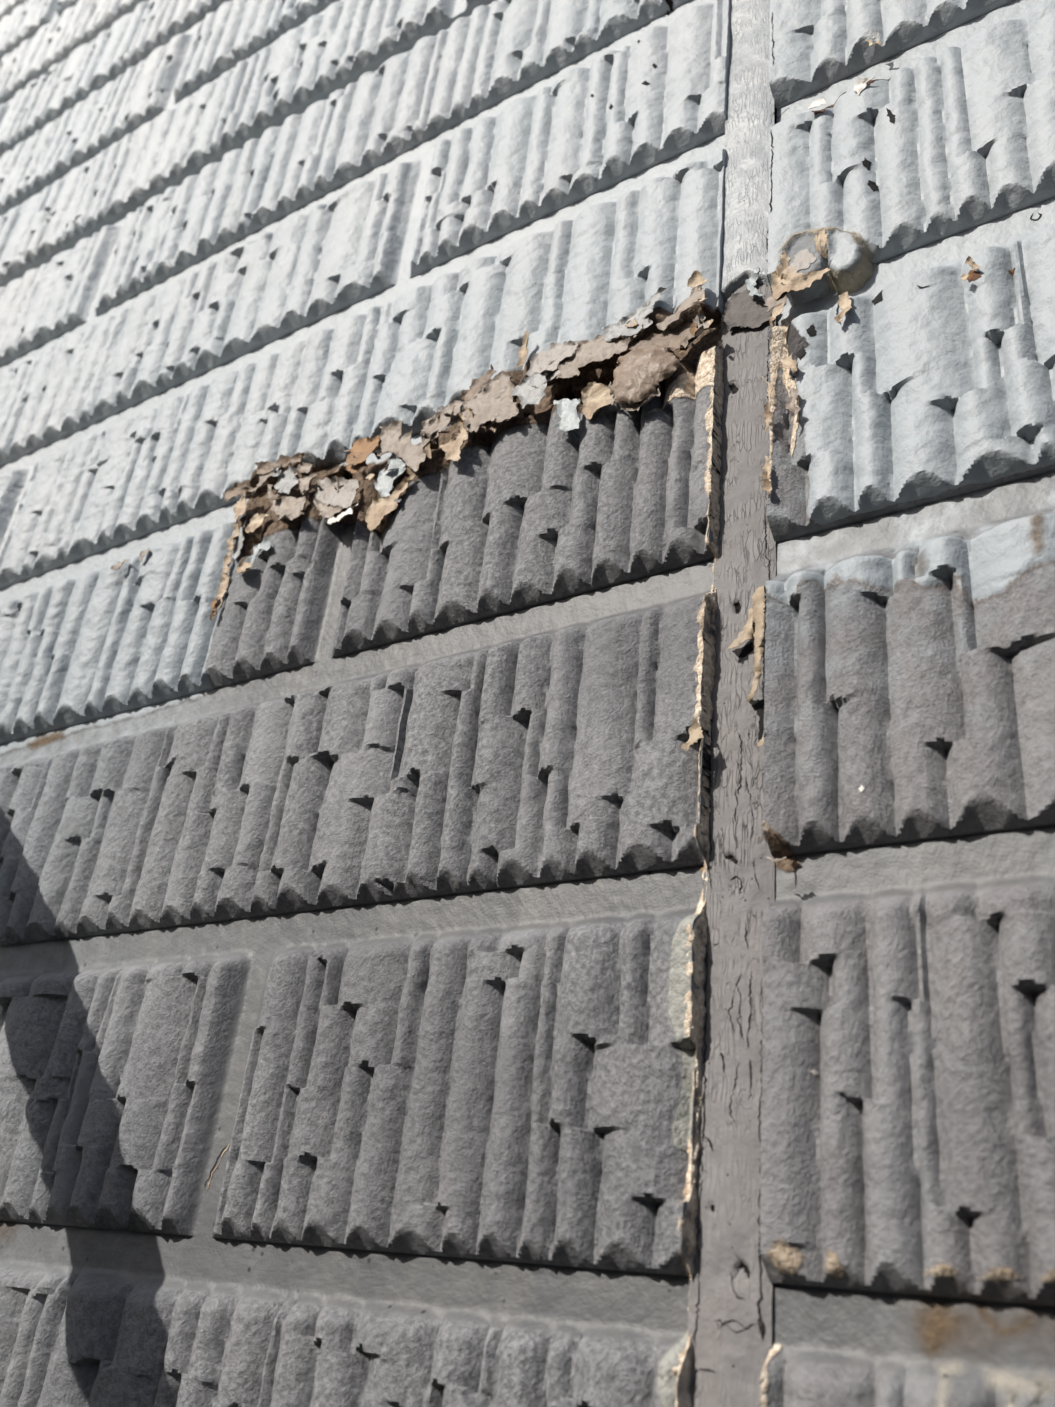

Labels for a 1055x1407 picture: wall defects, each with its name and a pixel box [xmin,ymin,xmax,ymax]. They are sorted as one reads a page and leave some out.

peeling [745,267,817,498]
crack [709,385,722,524]
crack [763,491,771,580]
peeling [210,284,767,1310]
crack [701,694,759,892]
spalling [760,820,800,872]
crack [692,923,763,1404]
spalling [766,1238,803,1275]
spalling [672,1334,693,1407]
spalling [760,1319,785,1407]